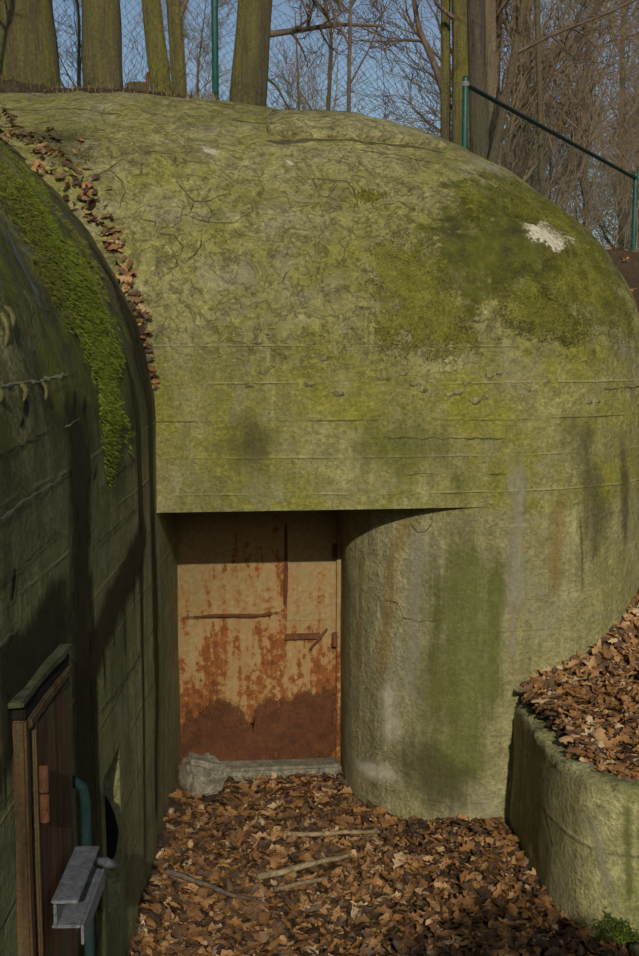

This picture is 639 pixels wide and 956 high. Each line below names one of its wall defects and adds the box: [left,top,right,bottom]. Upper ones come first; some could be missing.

rust [185,523,288,618]
rust [180,687,336,764]